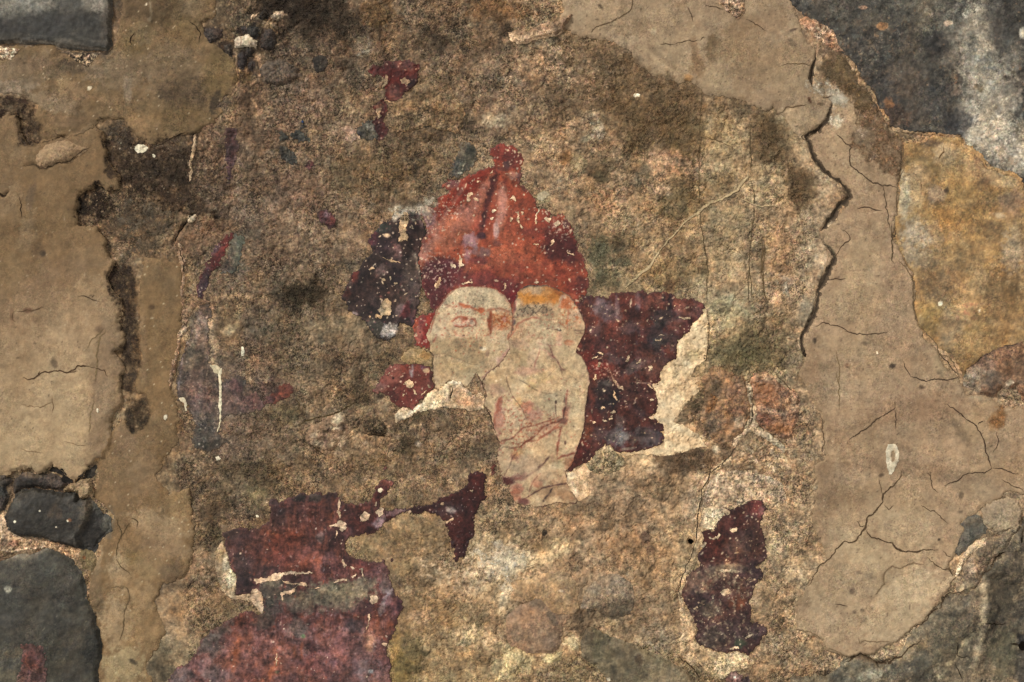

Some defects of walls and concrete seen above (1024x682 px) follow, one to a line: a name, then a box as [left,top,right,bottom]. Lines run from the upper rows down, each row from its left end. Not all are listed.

flaking render [790,0,1024,403]
crack [778,54,1024,522]
crack [22,329,119,446]
flaking render [395,380,485,423]
flaking render [566,309,800,501]
flaking render [0,465,113,682]
flaking render [214,541,252,602]
flaking render [494,568,695,682]
flaking render [693,641,755,679]
flaking render [701,469,787,530]
crack [808,471,966,664]
flaking render [790,514,1024,682]